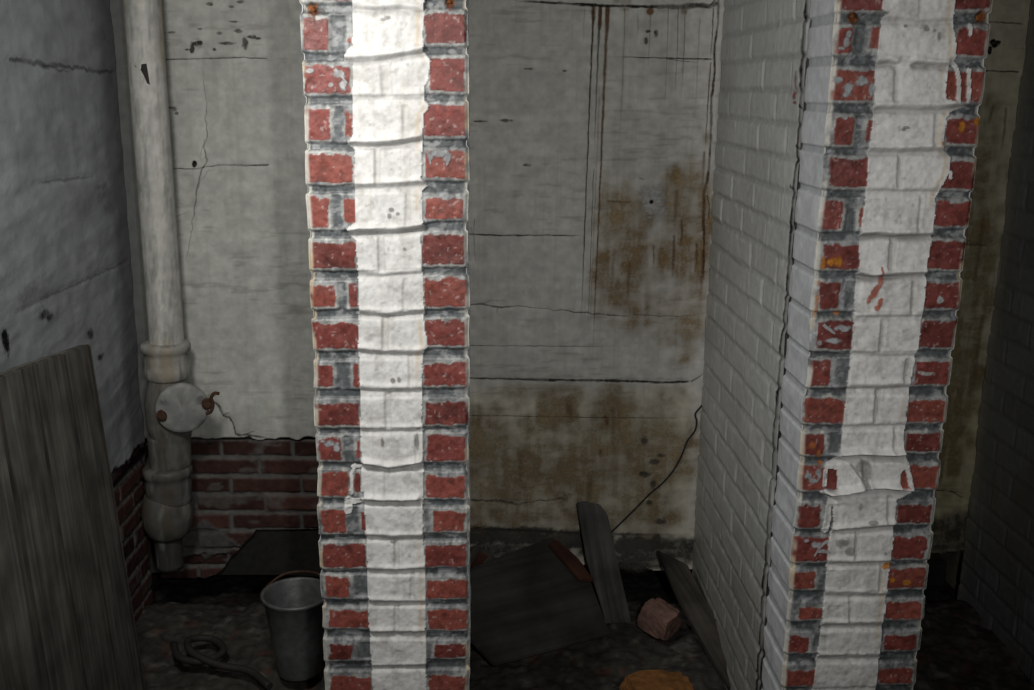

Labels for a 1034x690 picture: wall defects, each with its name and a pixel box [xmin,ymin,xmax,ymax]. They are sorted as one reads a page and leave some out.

peeling [329,68,347,90]
peeling [834,76,875,97]
peeling [426,149,451,166]
rust [583,6,610,290]
crack [529,0,719,273]
water stain [593,165,713,340]
peeling [867,267,884,311]
peeling [817,324,850,345]
water stain [469,389,698,571]
peeling [850,461,871,491]
flaking render [111,438,340,623]
peeling [804,539,854,556]